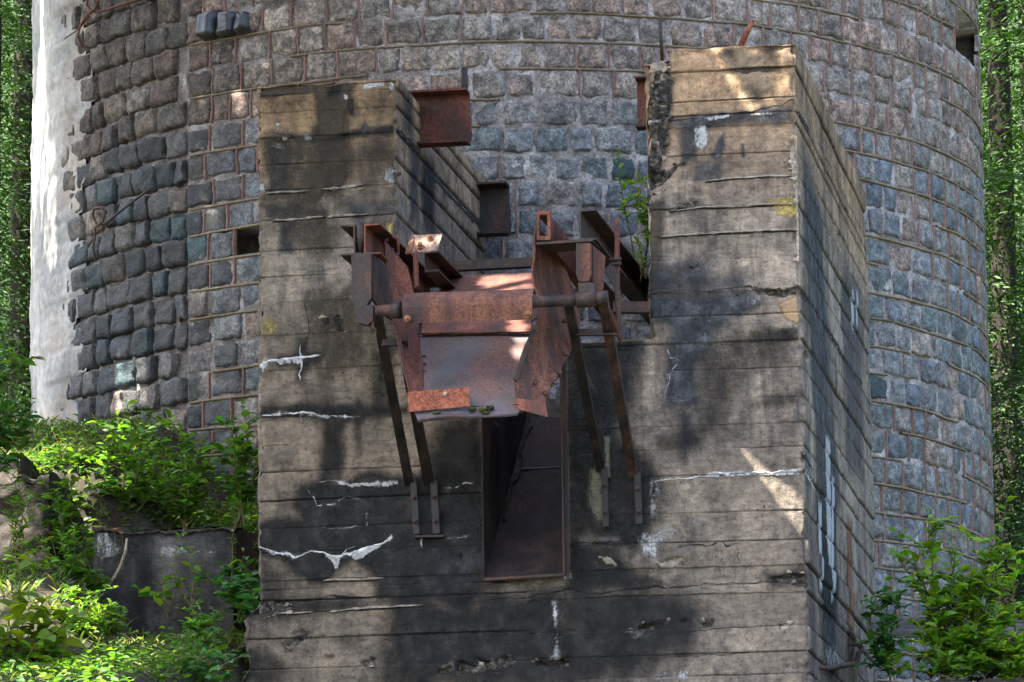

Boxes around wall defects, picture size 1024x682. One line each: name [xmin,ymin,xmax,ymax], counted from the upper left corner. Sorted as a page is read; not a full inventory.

spalling [644,61,685,205]
crack [259,292,319,380]
crack [263,411,358,420]
crack [658,454,813,488]
crack [260,480,398,569]
spalling [436,654,517,675]
spalling [531,656,569,669]